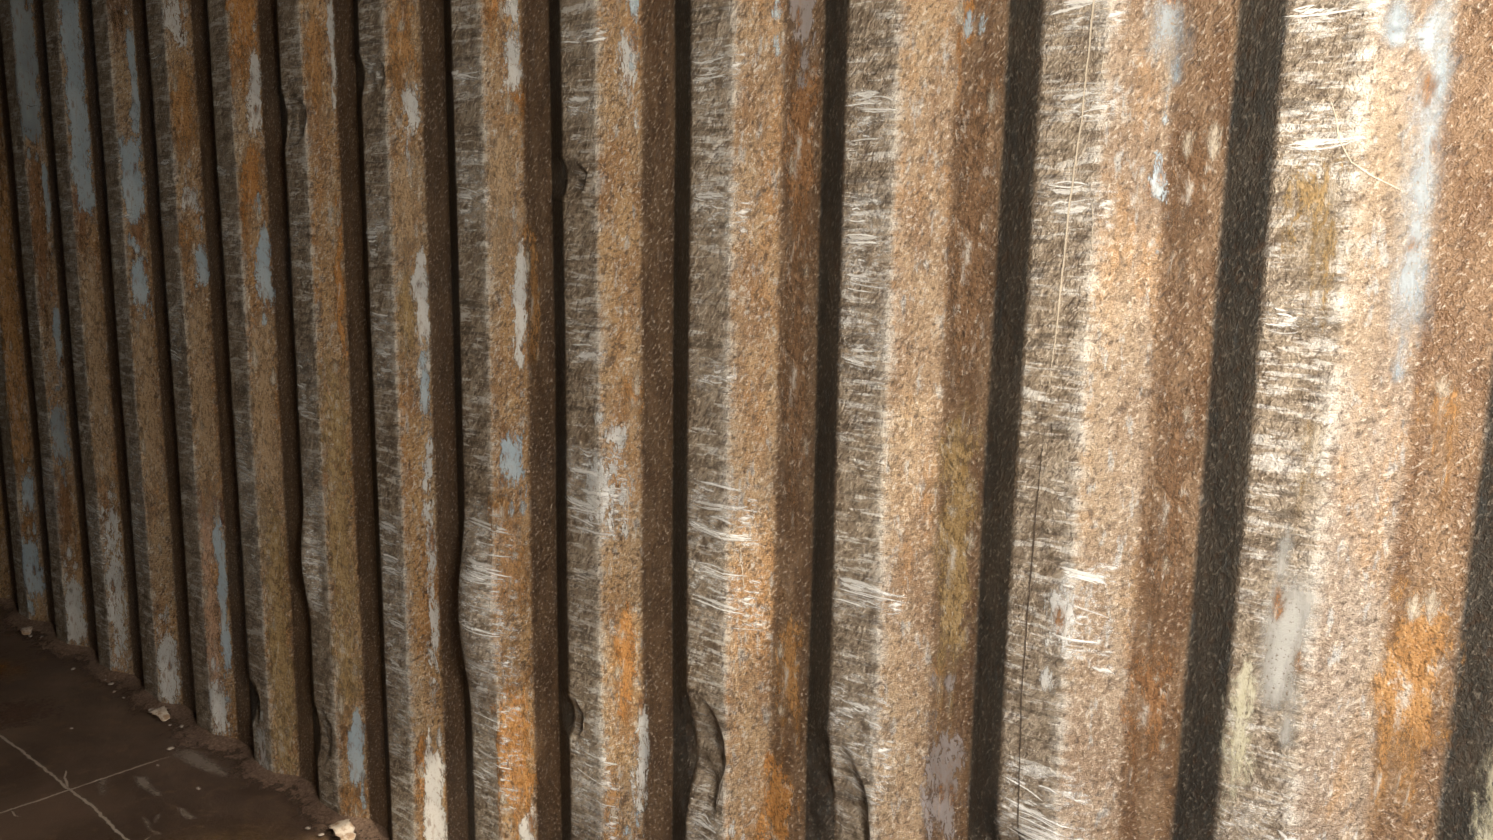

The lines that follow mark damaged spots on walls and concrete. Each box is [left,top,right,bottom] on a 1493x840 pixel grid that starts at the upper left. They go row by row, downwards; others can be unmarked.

peeling [963,0,988,39]
peeling [1388,6,1445,103]
corrosion [333,187,349,365]
corrosion [622,374,645,440]
corrosion [777,42,822,526]
corrosion [933,0,1002,731]
corrosion [183,292,227,731]
corrosion [489,675,537,840]
corrosion [603,753,622,840]
corrosion [613,601,638,745]
corrosion [753,596,806,840]
corrosion [1370,578,1464,818]